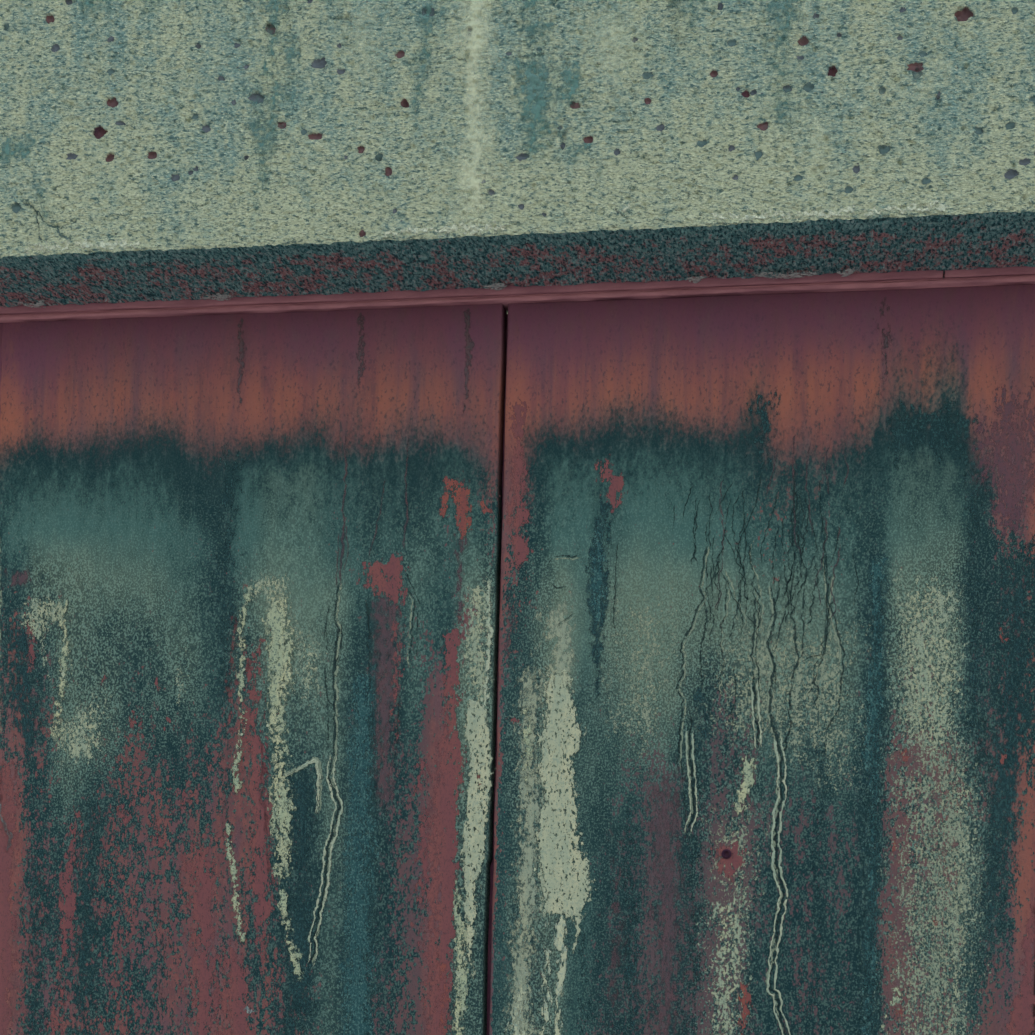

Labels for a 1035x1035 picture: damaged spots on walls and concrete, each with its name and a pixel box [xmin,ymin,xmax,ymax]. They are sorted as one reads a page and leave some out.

leakage [460,0,488,211]
leakage [508,0,592,157]